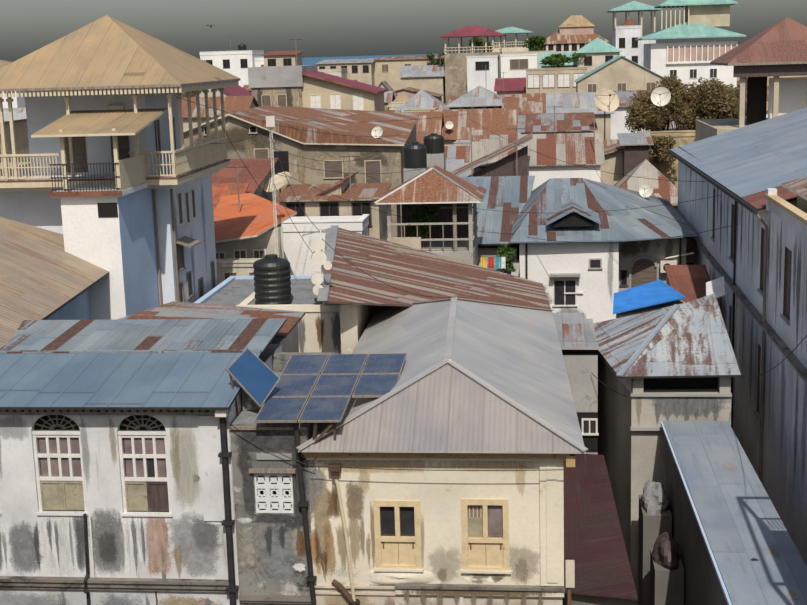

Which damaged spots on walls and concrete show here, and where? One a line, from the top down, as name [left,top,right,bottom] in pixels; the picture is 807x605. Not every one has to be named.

damp [652,397,725,423]
damp [0,595,66,605]
damp [0,511,145,572]
peeling [145,513,171,579]
damp [170,515,221,576]
damp [327,482,375,566]
damp [402,569,545,605]
damp [516,559,528,580]